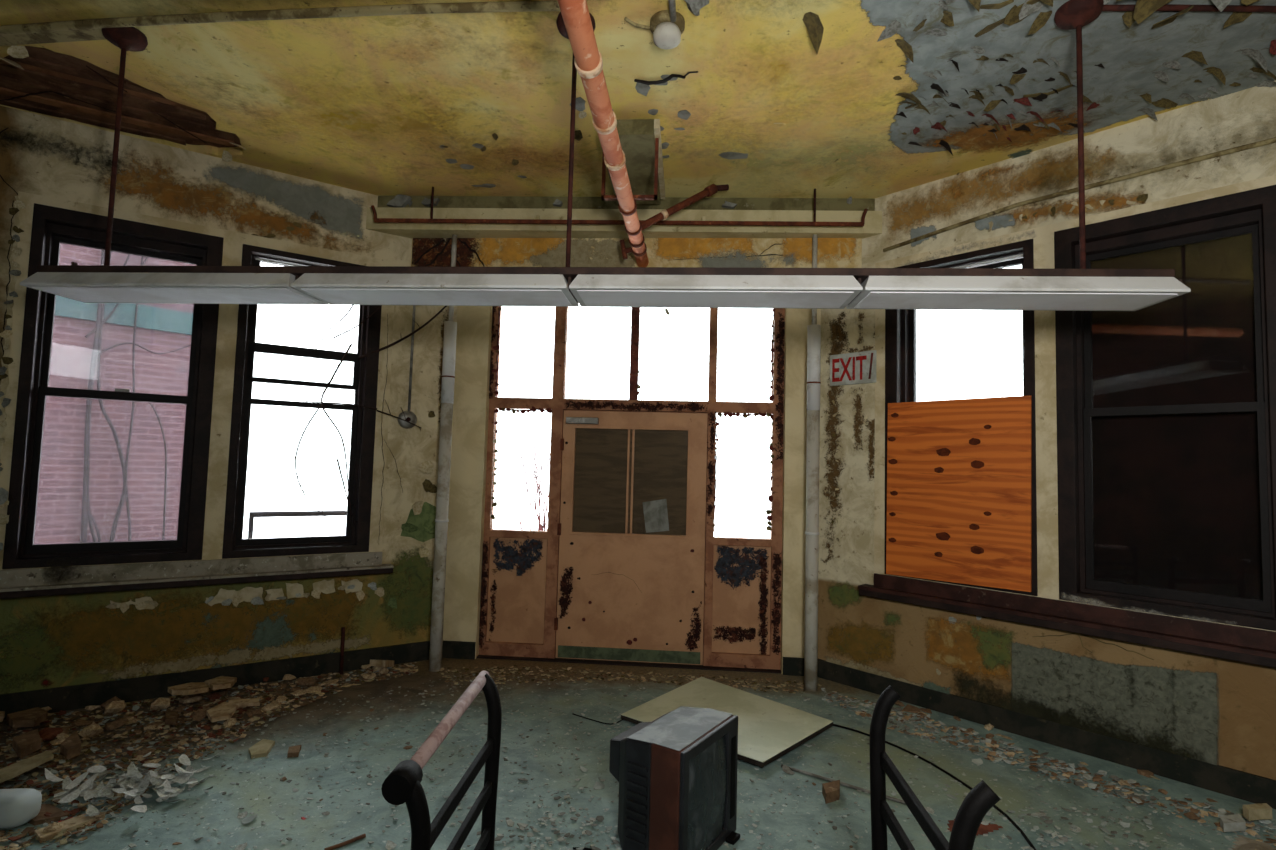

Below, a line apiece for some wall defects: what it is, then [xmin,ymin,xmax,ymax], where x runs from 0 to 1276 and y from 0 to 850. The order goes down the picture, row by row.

damp [0,127,361,250]
flaking render [0,45,363,239]
peeling [570,97,587,141]
peeling [634,71,698,158]
peeling [719,152,748,160]
peeling [975,214,1015,232]
damp [888,149,1114,231]
peeling [860,0,1276,159]
peeling [400,461,437,568]
peeling [106,596,158,613]
damp [40,577,364,680]
peeling [205,579,397,608]